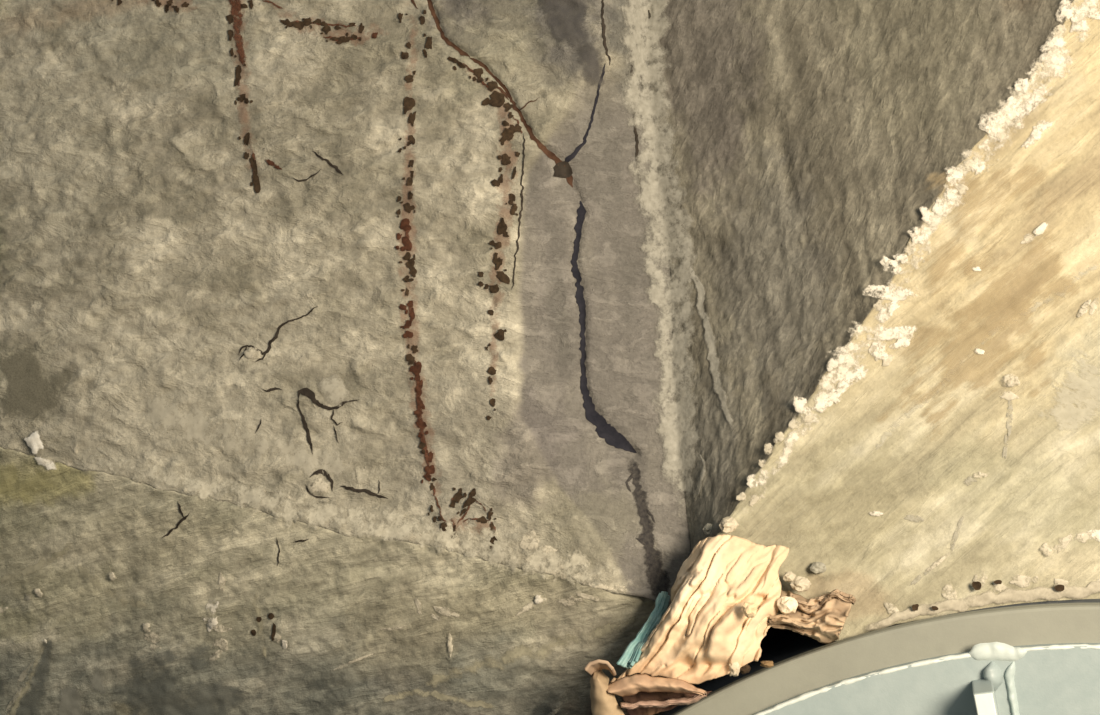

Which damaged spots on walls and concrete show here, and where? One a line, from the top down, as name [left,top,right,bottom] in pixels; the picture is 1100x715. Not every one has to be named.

corrosion [226,0,378,105]
corrosion [398,10,432,60]
corrosion [239,132,282,193]
crack [294,151,343,182]
corrosion [447,56,522,293]
crack [238,307,316,362]
corrosion [395,96,497,549]
corrosion [485,329,507,350]
crack [411,0,670,596]
crack [263,387,388,499]
crack [162,503,189,538]
crack [276,538,308,565]